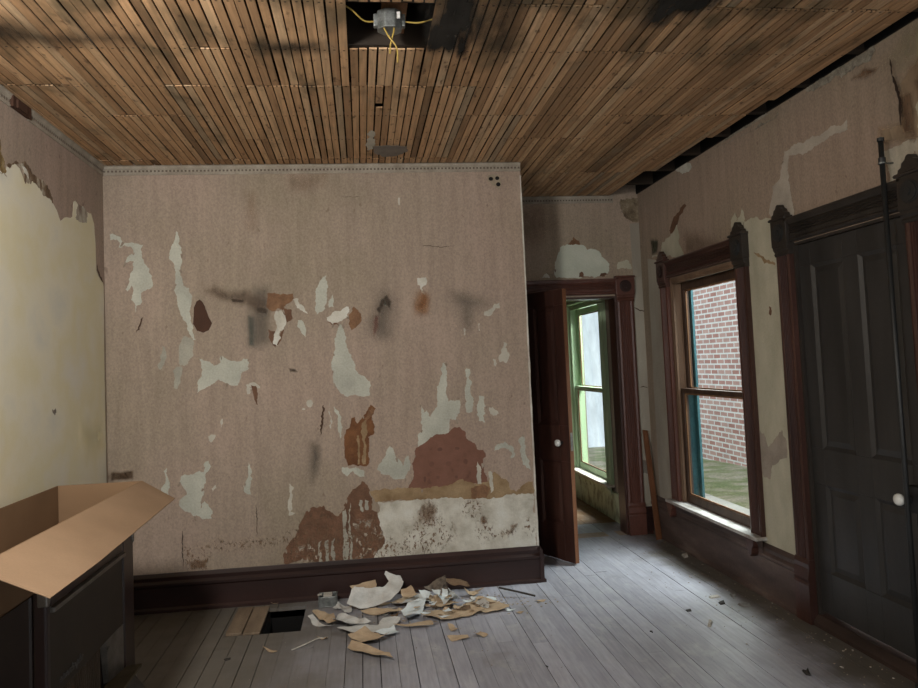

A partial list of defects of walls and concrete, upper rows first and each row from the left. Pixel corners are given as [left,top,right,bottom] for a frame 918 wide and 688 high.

flaking render [0,140,107,508]
peeling [110,233,153,312]
peeling [169,231,260,405]
peeling [266,276,371,397]
flaking render [283,175,539,564]
flaking render [731,120,848,555]
peeling [161,461,216,521]
damp [463,501,533,539]